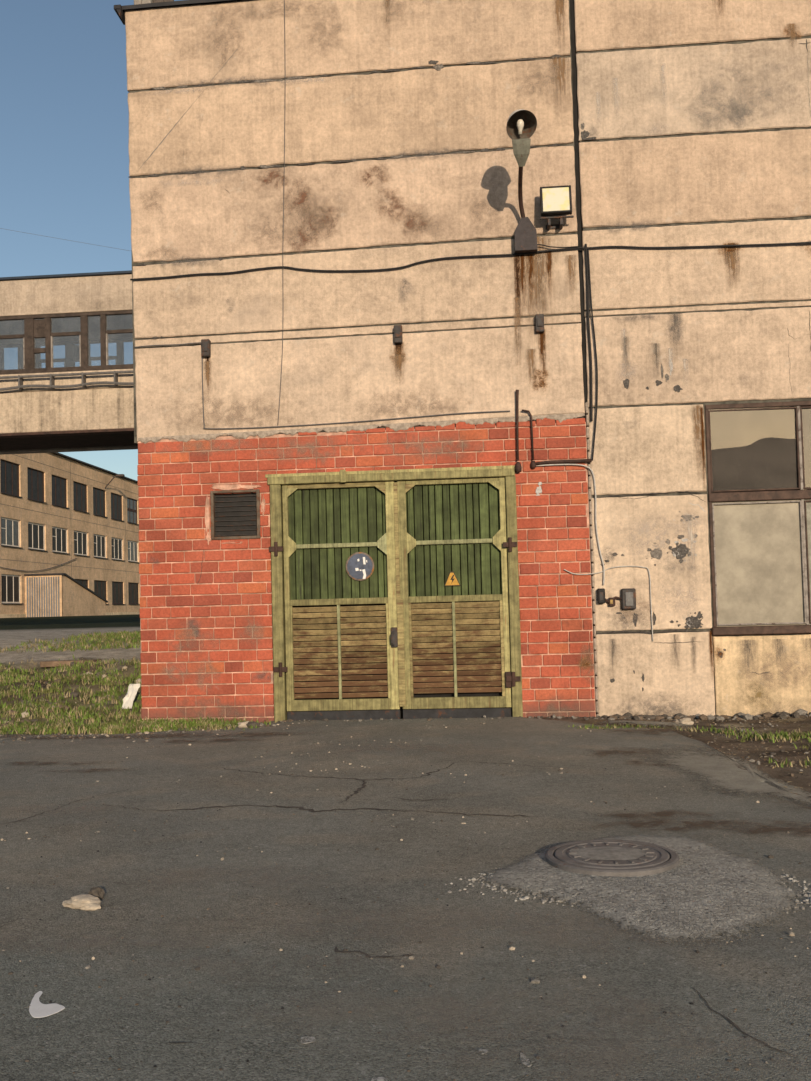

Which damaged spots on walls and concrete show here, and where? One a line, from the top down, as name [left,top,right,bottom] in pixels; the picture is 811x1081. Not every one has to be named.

water stain [260,170,285,185]
water stain [292,189,334,250]
water stain [380,191,426,232]
rust [722,243,738,277]
rust [514,236,552,390]
rust [392,344,405,374]
spalling [646,511,699,566]
spalling [616,610,656,627]
spalling [670,611,703,632]